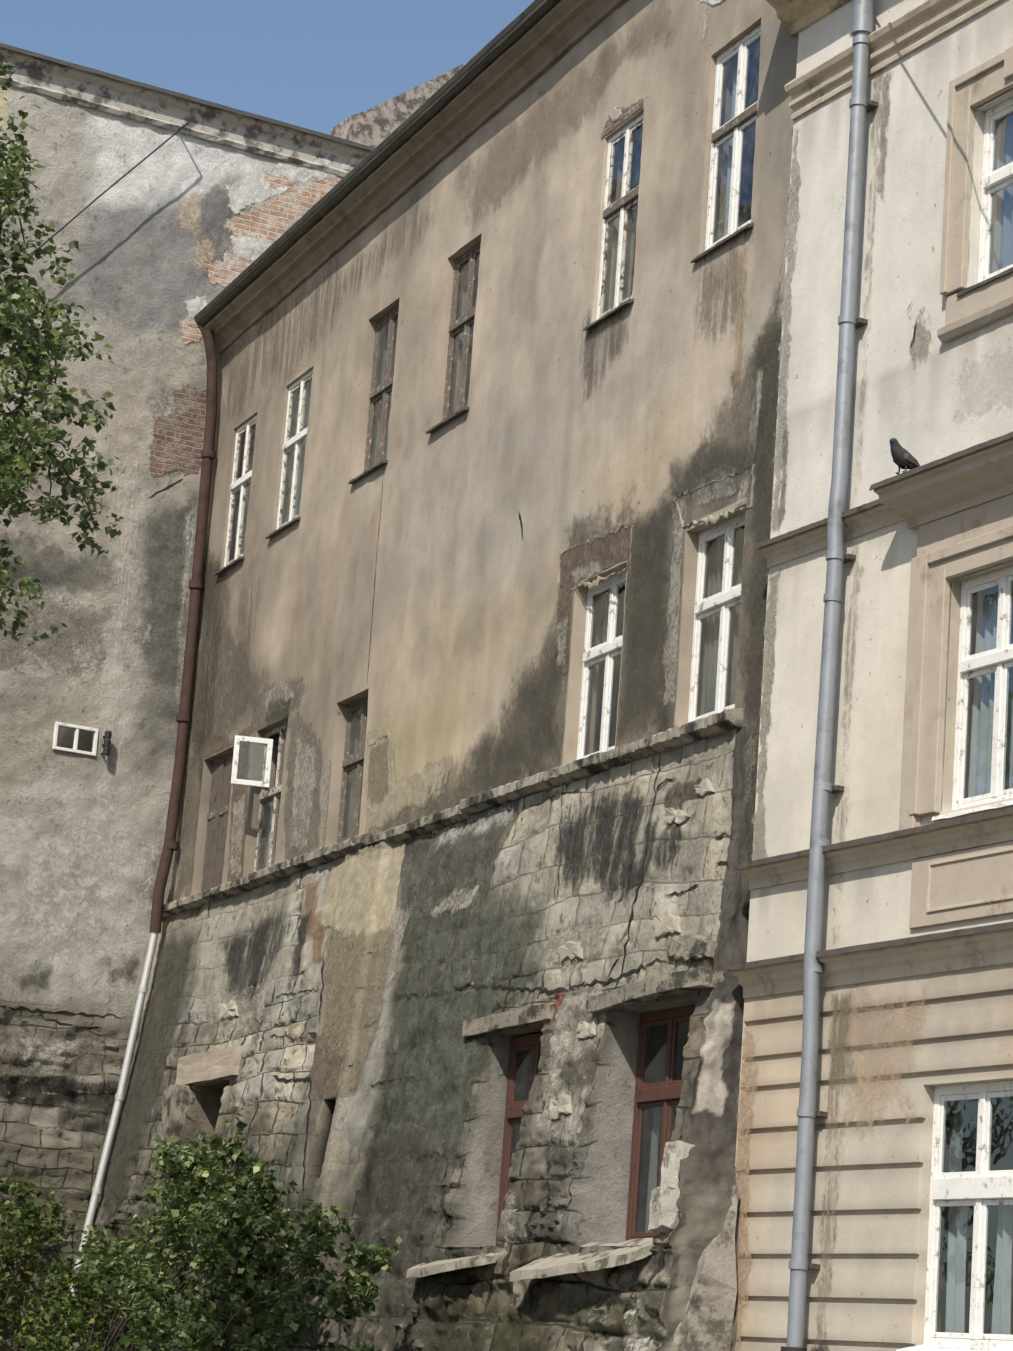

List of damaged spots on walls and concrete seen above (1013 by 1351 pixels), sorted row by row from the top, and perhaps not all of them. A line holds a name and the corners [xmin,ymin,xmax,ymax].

flaking render [179,157,360,344]
leakage [369,290,784,861]
leakage [0,483,264,902]
leakage [555,785,682,904]
spalling [663,778,715,824]
crack [0,1005,125,1030]
leakage [223,908,310,999]
crack [269,946,325,1040]
crack [356,832,733,1052]
spalling [536,905,608,1183]
spalling [645,914,718,980]
crack [272,1071,312,1196]